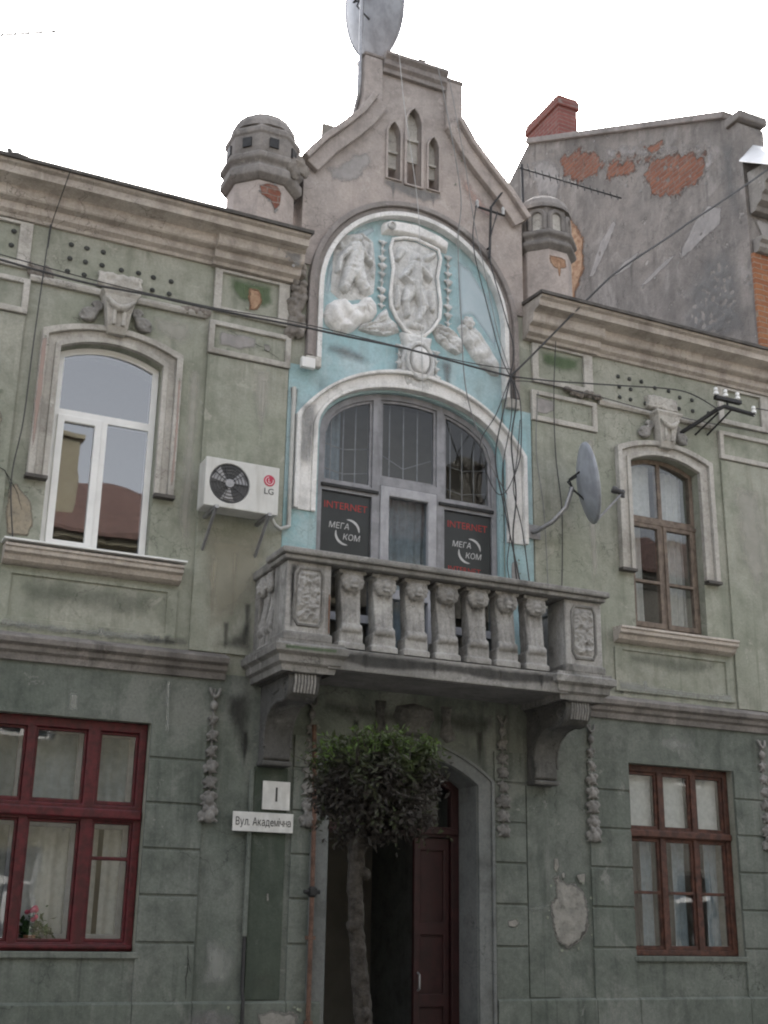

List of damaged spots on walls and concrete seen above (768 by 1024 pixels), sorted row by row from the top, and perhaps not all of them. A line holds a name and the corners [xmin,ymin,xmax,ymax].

flaking render [259,183,281,213]
flaking render [532,138,716,204]
flaking render [570,220,587,297]
spalling [246,284,264,310]
spalling [5,480,36,536]
spalling [533,858,592,952]